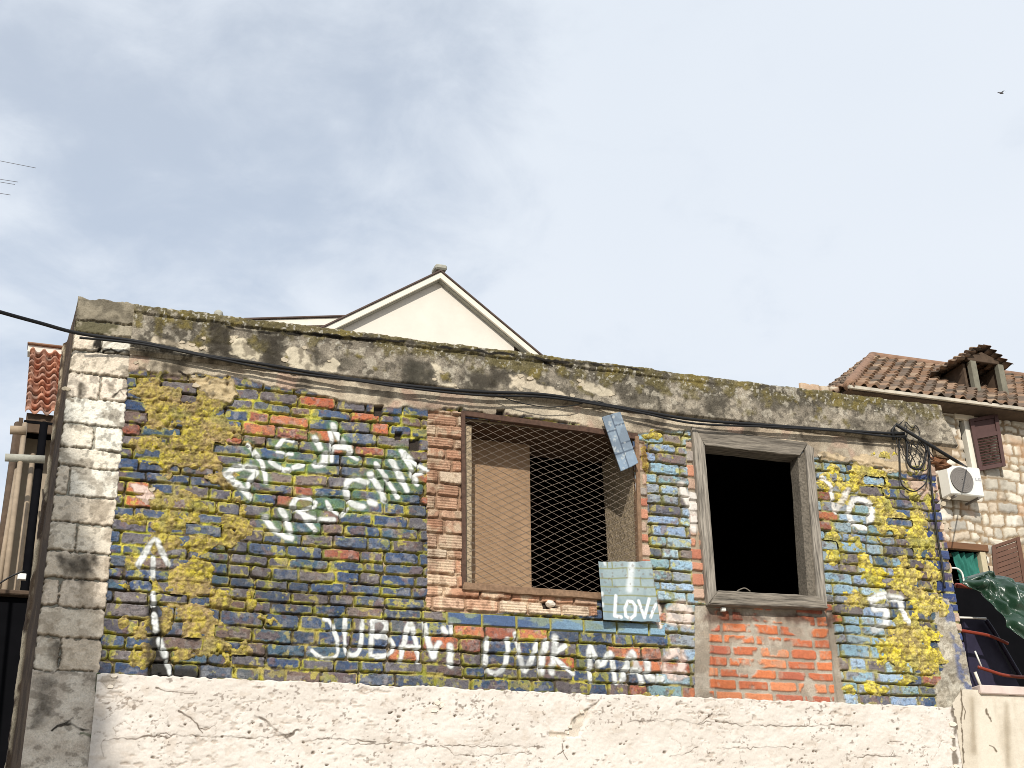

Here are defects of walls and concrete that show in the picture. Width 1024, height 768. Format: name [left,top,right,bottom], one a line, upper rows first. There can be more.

peeling [229,336,262,361]
water stain [402,360,436,386]
peeling [509,374,615,397]
crack [114,687,209,740]
crack [685,717,852,754]